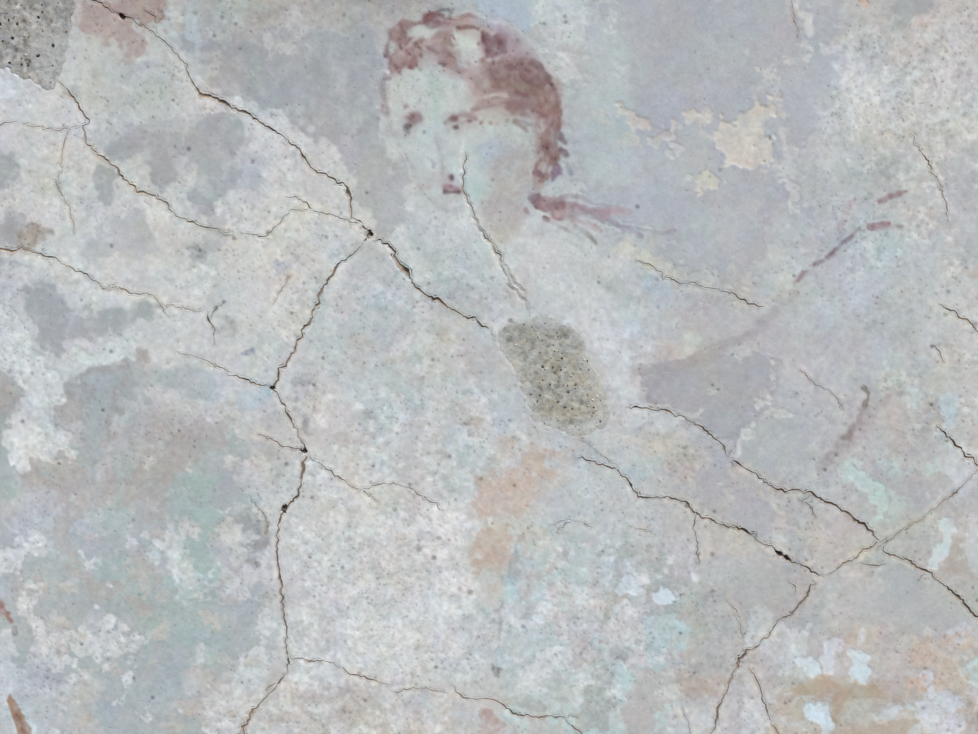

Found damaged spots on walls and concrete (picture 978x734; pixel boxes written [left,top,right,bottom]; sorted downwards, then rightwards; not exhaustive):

crack [789,0,801,37]
flaking render [0,0,81,99]
crack [908,132,950,221]
crack [636,258,765,309]
crack [938,303,978,336]
crack [0,0,586,734]
flaking render [493,311,616,440]
crack [799,369,846,411]
crack [931,344,945,362]
crack [550,517,594,531]
crack [576,404,978,734]
corrosion [0,598,19,636]